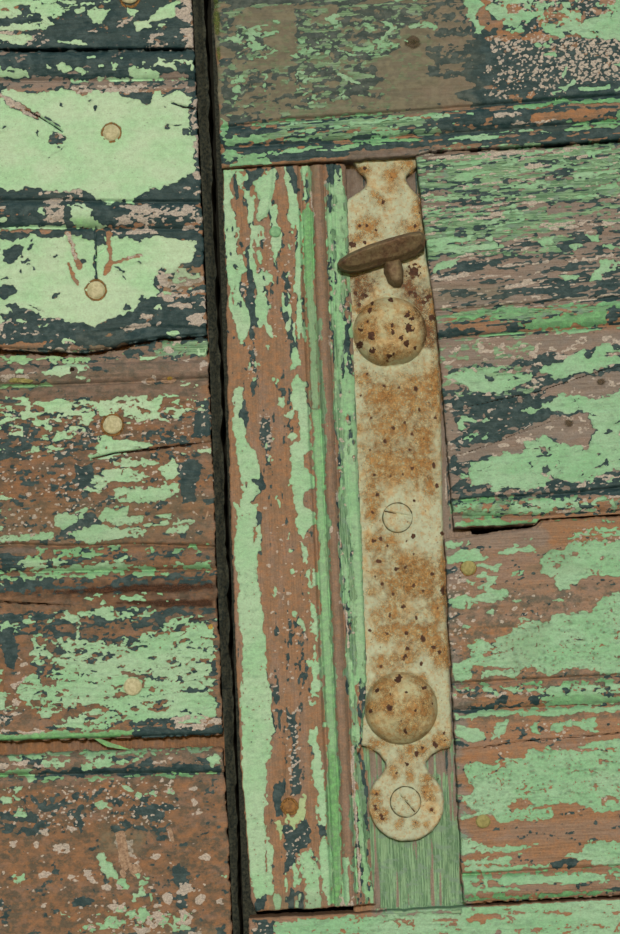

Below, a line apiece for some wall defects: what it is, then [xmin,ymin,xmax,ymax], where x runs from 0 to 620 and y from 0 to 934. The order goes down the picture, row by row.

peeling [0,0,111,45]
peeling [0,55,200,328]
rust [349,218,380,248]
rust [351,263,437,364]
peeling [0,338,207,454]
peeling [0,435,212,586]
crack [99,442,210,458]
rust [356,361,441,520]
peeling [220,111,620,934]
peeling [0,592,221,799]
rust [365,529,449,812]
rust [371,789,428,827]